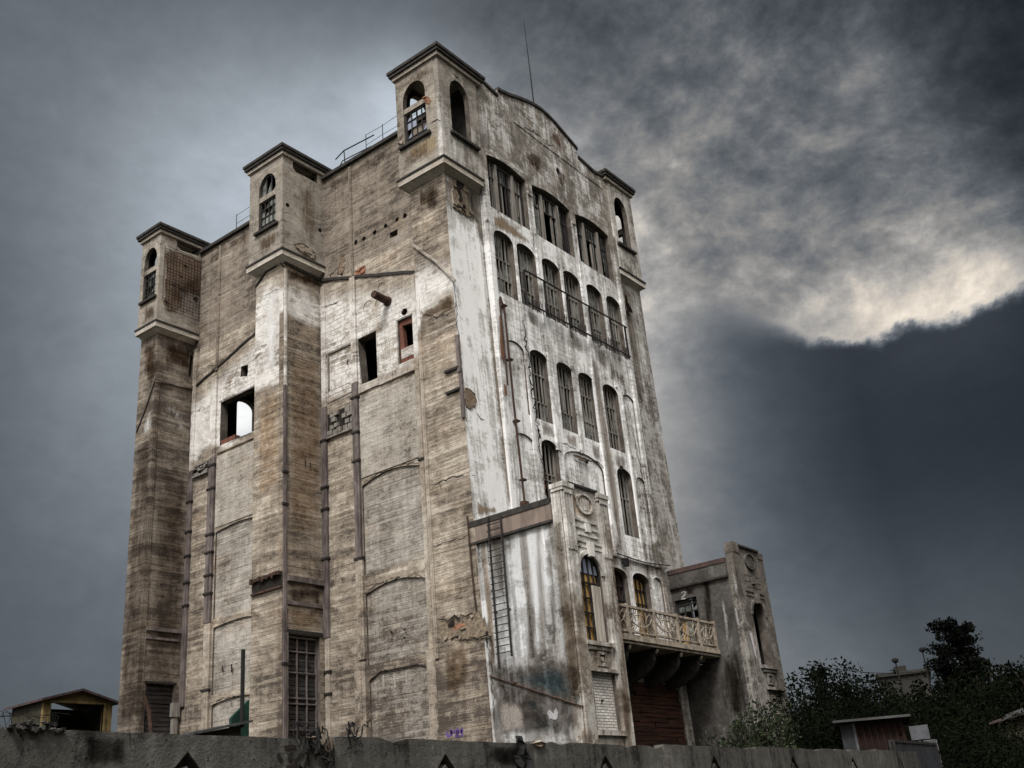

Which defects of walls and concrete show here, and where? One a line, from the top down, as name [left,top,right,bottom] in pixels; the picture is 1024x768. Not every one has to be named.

spalling [464,387,477,410]
spalling [438,612,491,643]